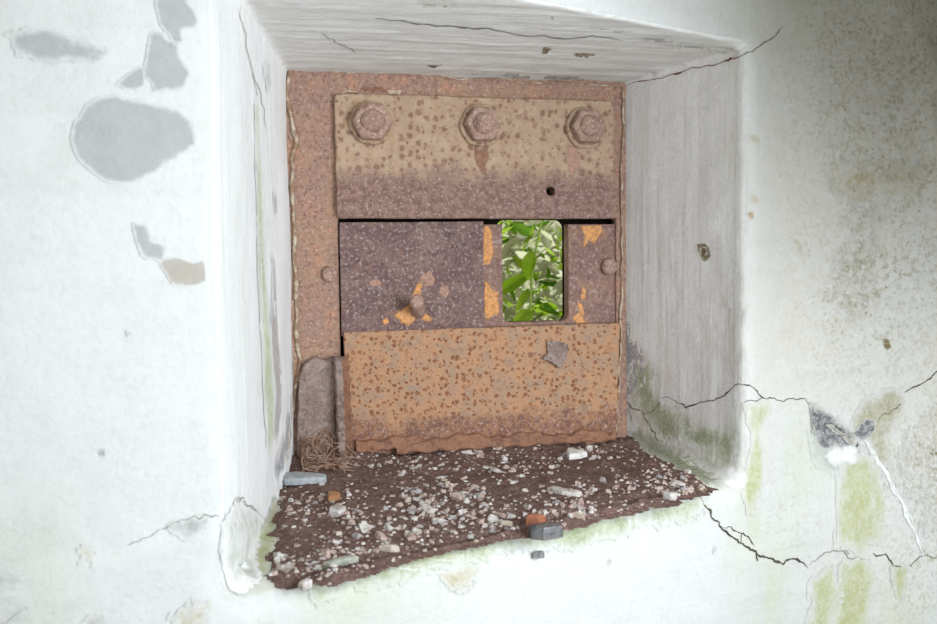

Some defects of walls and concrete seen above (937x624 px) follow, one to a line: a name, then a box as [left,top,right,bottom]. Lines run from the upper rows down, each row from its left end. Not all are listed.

crack [240,6,266,126]
crack [380,18,622,41]
crack [625,26,784,87]
rust [474,148,489,172]
rust [418,271,450,298]
leakage [275,410,292,480]
crack [627,383,808,441]
spalling [805,401,876,478]
leakage [848,386,937,556]
crack [879,371,937,419]
crack [701,498,937,568]